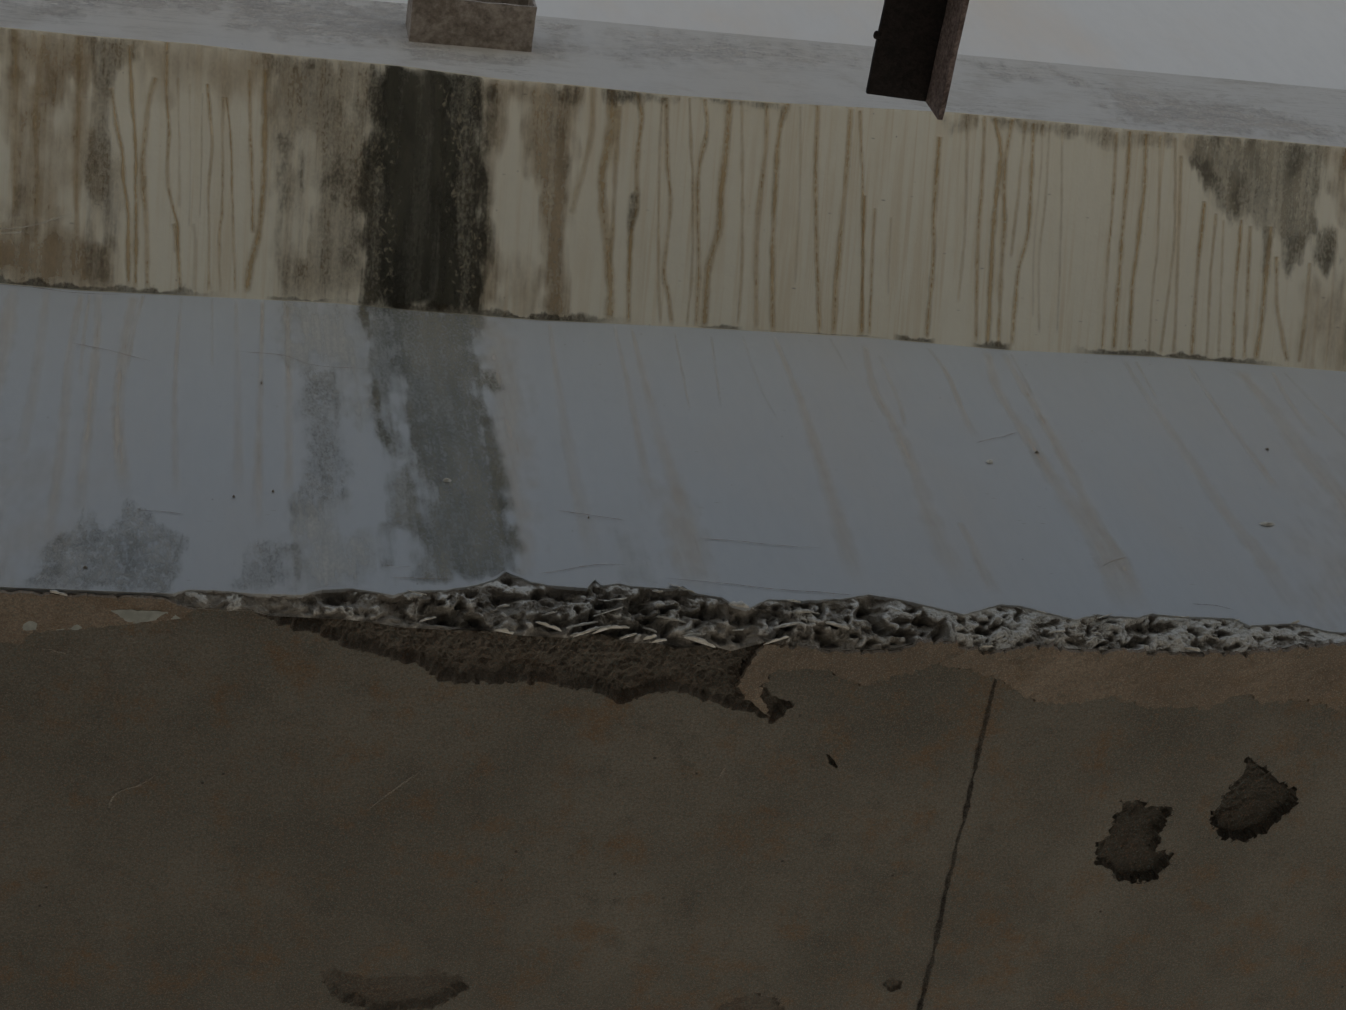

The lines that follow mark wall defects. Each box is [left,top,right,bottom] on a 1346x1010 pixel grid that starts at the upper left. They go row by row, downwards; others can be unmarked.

water stain [0,37,145,283]
water stain [491,83,579,314]
water stain [600,89,649,223]
water stain [628,196,637,282]
water stain [1233,226,1277,355]
spalling [6,573,1346,724]
crack [917,682,996,1010]
spalling [1094,798,1174,885]
spalling [1209,756,1299,843]